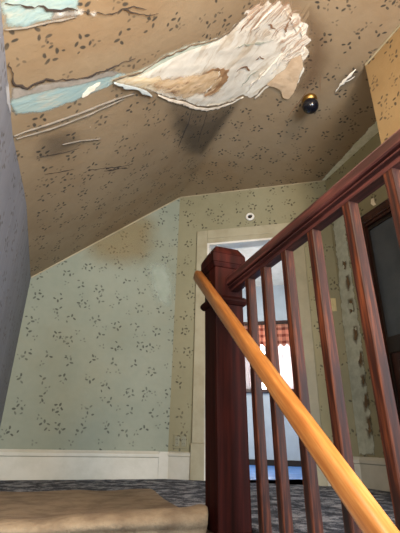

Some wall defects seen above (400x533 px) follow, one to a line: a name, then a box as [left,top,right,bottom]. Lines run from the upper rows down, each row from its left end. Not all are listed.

peeling [113,0,311,112]